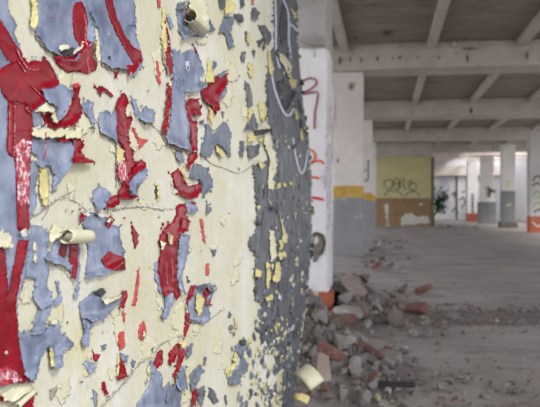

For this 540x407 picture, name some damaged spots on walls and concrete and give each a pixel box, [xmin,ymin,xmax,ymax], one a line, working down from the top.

crack [32,190,94,220]
crack [112,203,173,211]
peeling [0,0,335,407]
spalling [401,213,431,226]
crack [101,335,183,407]